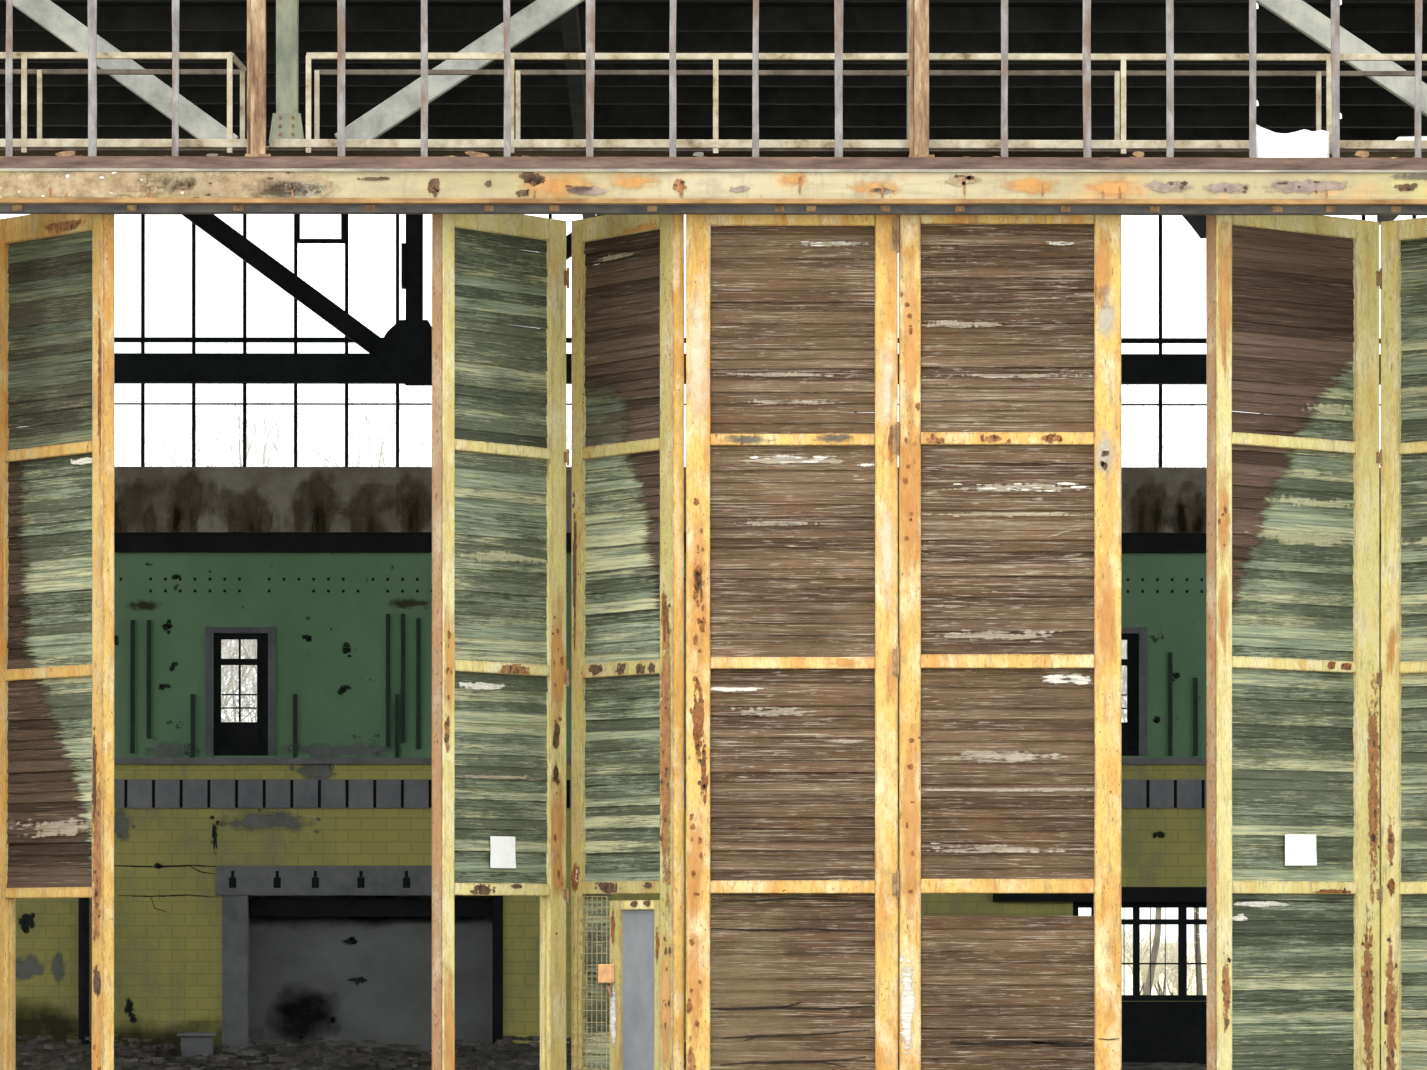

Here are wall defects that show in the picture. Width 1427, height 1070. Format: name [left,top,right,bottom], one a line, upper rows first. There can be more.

rust [525,177,590,198]
rust [616,176,651,187]
rust [673,179,687,198]
rust [783,173,804,194]
rust [855,183,897,198]
rust [1011,178,1050,196]